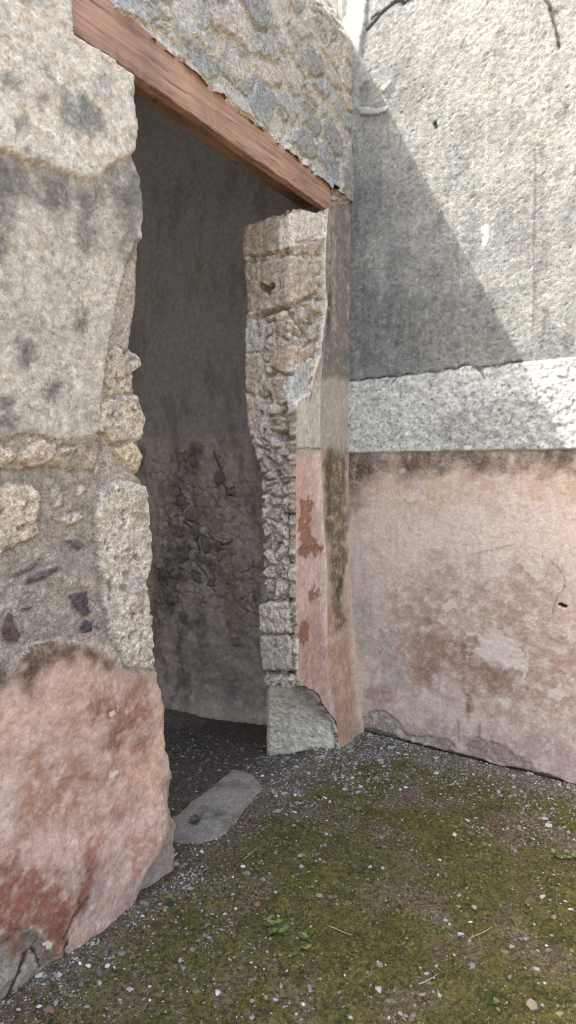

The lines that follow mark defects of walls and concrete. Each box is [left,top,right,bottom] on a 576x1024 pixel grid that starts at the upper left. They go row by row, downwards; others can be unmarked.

damp [326,450,388,648]
flaking render [464,630,529,678]
flaking render [547,683,570,702]
spalling [362,710,533,771]